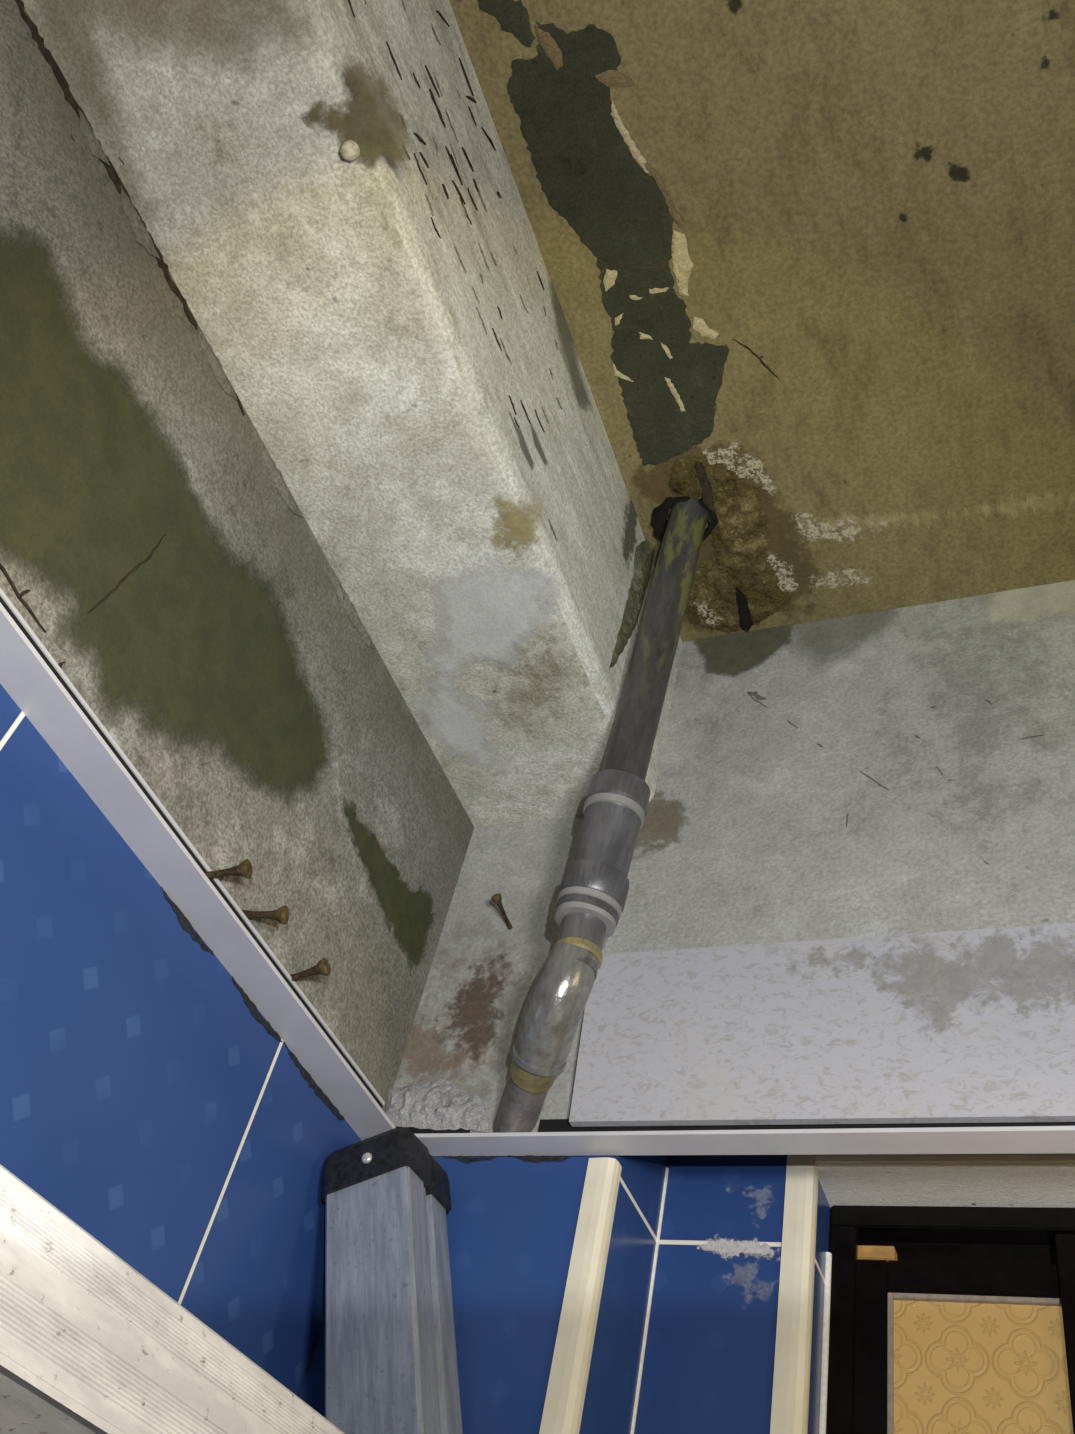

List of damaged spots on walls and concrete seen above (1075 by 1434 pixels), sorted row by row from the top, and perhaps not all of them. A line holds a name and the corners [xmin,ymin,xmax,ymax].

spalling [915,146,932,162]
spalling [948,162,970,182]
peeling [478,0,817,634]
damp [0,230,327,800]
corrosion [402,956,509,1074]